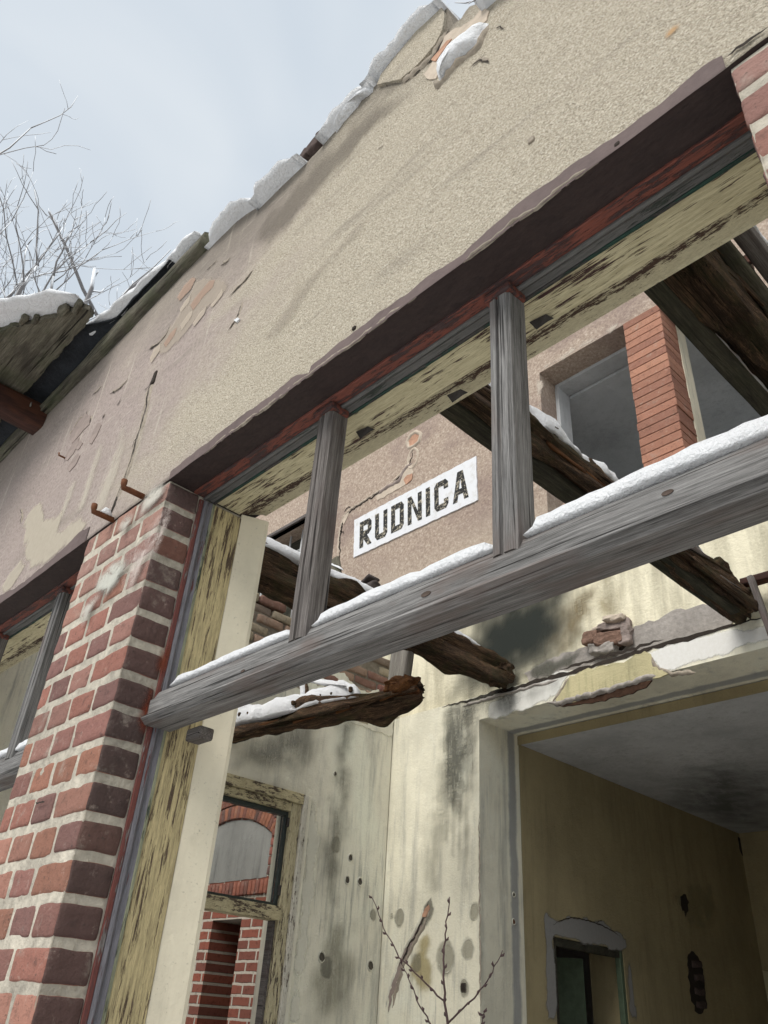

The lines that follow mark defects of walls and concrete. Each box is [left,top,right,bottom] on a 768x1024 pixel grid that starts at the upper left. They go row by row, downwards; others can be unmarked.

crack [377,8,448,87]
spalling [424,9,490,89]
spalling [464,163,598,263]
peeling [65,414,102,472]
crack [86,325,171,512]
spalling [205,297,416,454]
peeling [3,503,85,592]
crack [337,450,413,557]
crack [444,618,761,707]
spalling [489,613,768,719]
water stain [445,706,470,804]
spalling [687,951,707,1014]